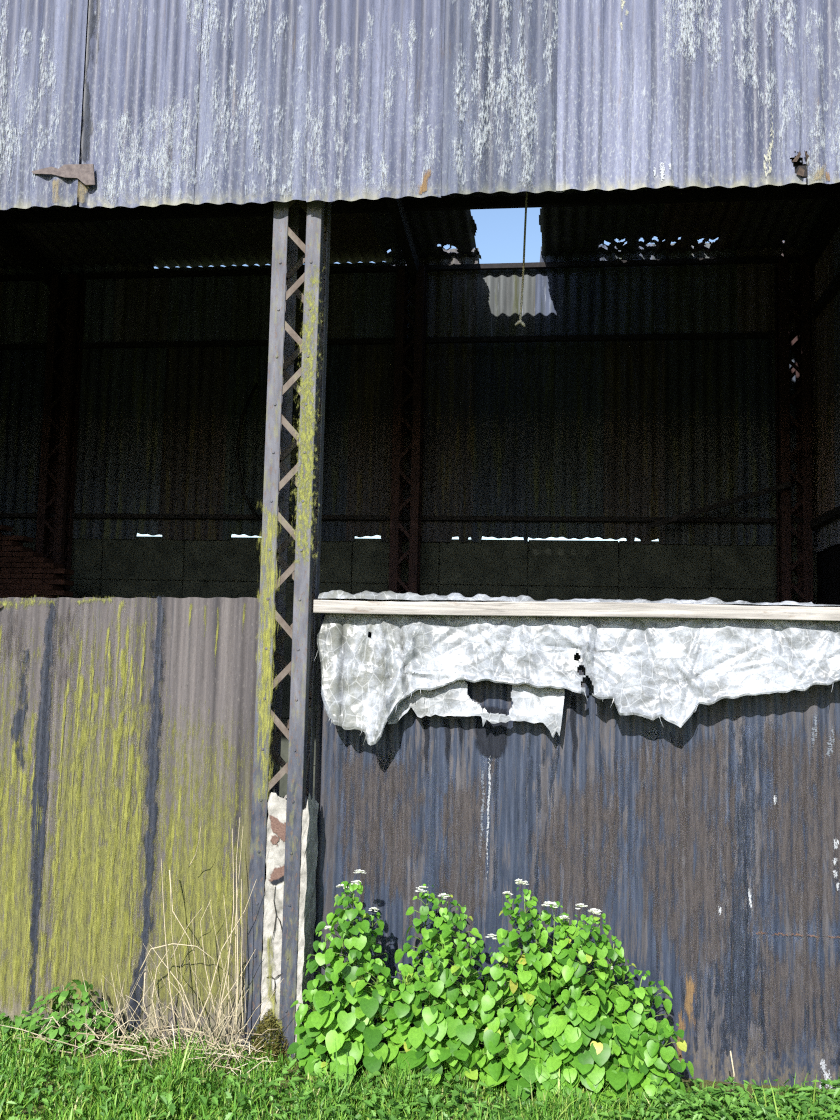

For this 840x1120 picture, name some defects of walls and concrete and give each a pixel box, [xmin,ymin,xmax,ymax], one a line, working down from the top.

leakage [80,0,100,161]
leakage [763,117,774,176]
leakage [0,595,206,1037]
rust [677,977,694,1061]